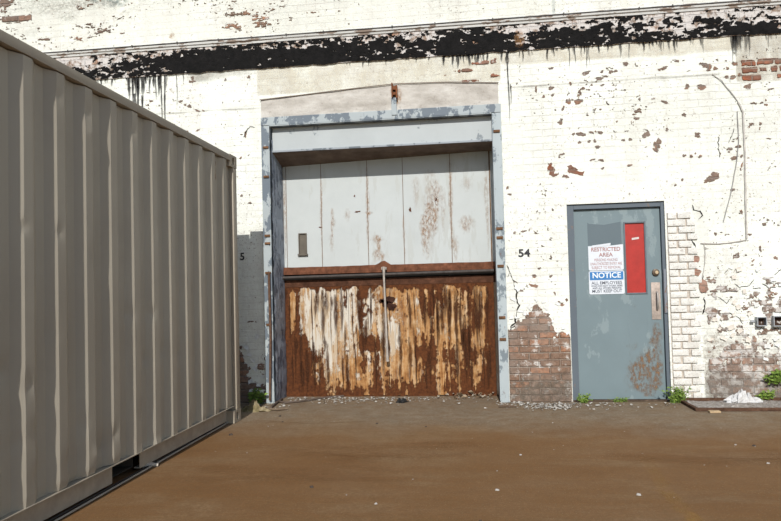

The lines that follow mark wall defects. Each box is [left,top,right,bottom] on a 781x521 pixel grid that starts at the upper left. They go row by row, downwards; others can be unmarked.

peeling [0,0,57,49]
peeling [168,0,285,37]
leakage [729,34,781,79]
leakage [126,74,184,113]
peeling [511,59,684,125]
peeling [572,94,670,167]
flaking render [699,47,781,171]
rust [284,281,497,397]
crack [507,266,520,330]
spalling [508,267,572,402]
rust [632,324,661,393]
peeling [693,233,781,398]